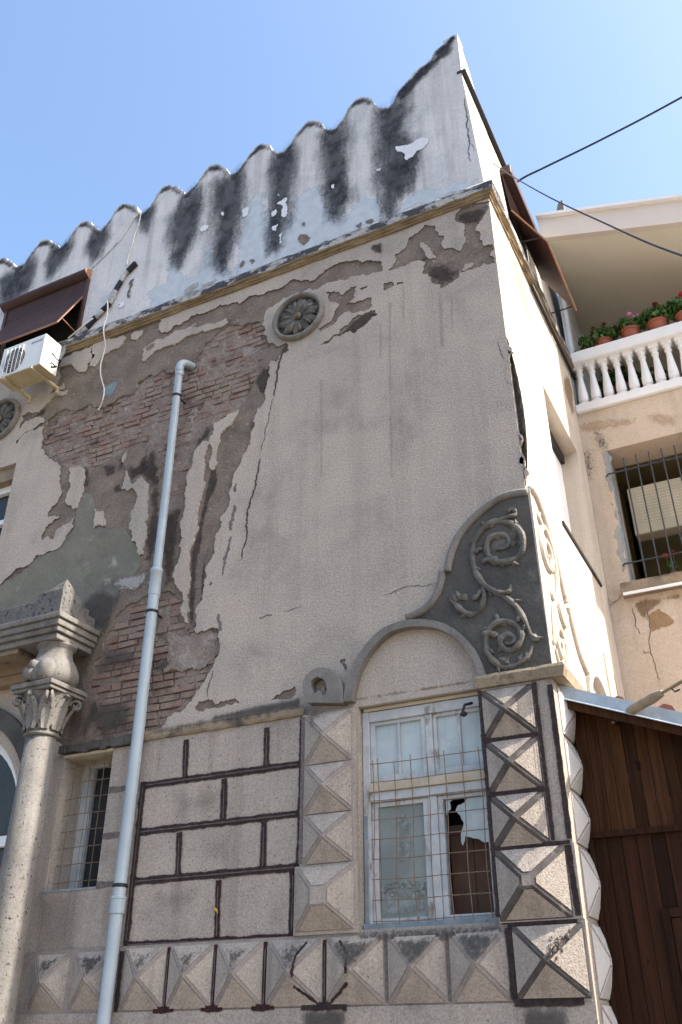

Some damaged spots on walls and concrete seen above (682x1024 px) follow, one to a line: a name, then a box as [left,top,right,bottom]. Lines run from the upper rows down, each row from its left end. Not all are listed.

damp [0,238,73,302]
damp [86,228,108,261]
damp [168,170,246,272]
damp [268,144,297,249]
peeling [147,177,478,308]
damp [320,123,348,217]
peeling [395,137,429,160]
crack [464,98,474,161]
flaking render [0,201,495,746]
crack [209,344,287,585]
crack [608,596,660,680]
flaking render [649,609,674,632]